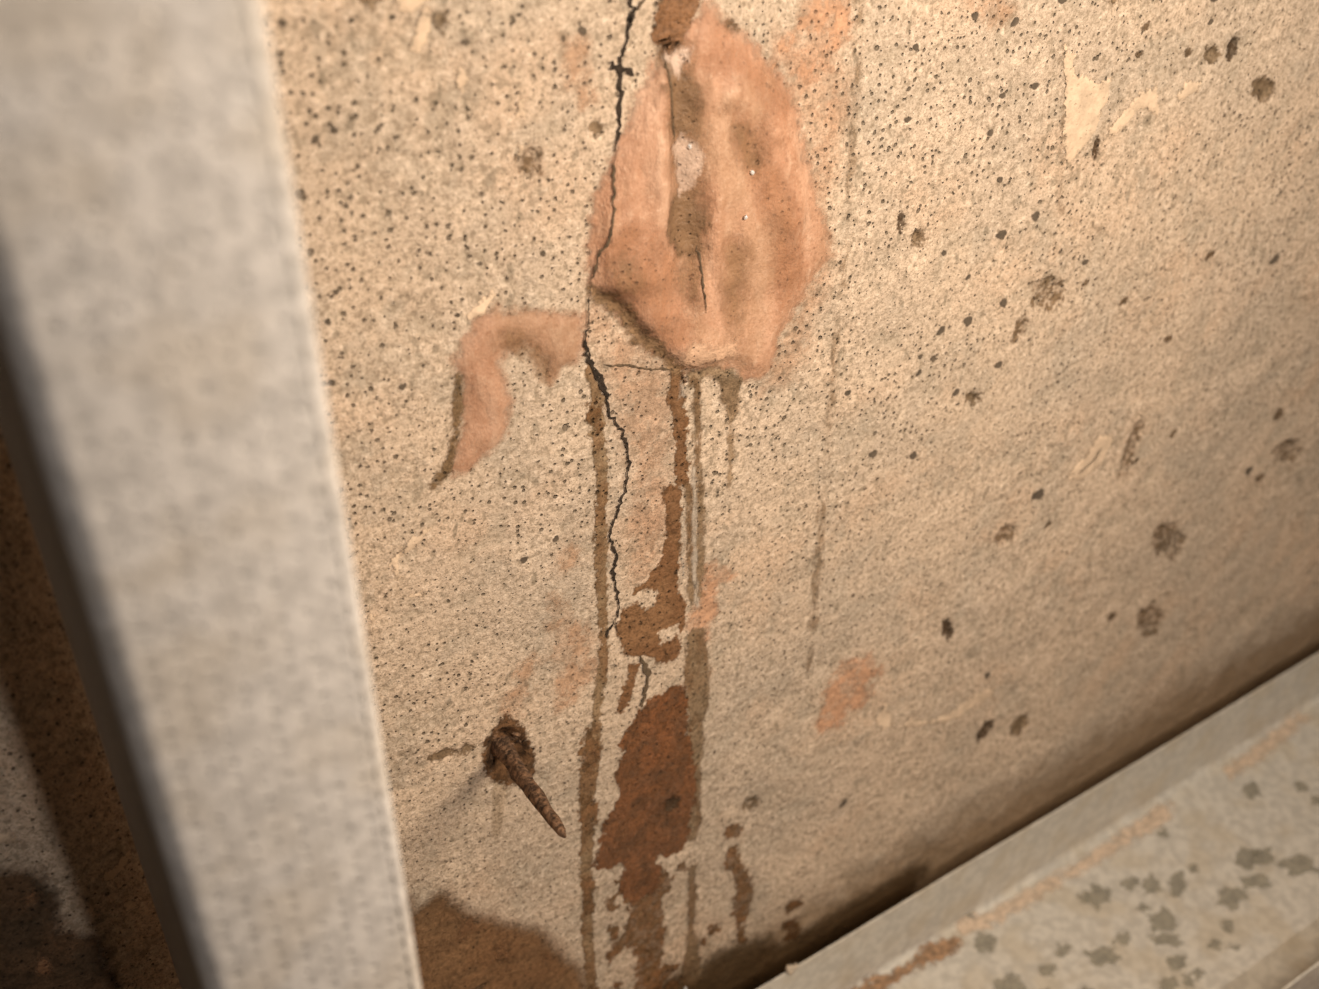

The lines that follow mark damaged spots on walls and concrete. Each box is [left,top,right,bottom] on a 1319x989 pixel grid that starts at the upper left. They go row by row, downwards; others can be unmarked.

crack [663,56,675,143]
leakage [758,0,851,85]
crack [584,0,652,707]
leakage [407,0,744,989]
rust [482,714,537,787]
leakage [0,871,119,989]
rust [591,685,697,989]
rust [701,823,755,947]
rust [781,895,804,941]
leakage [661,864,926,989]
leakage [957,806,1170,935]